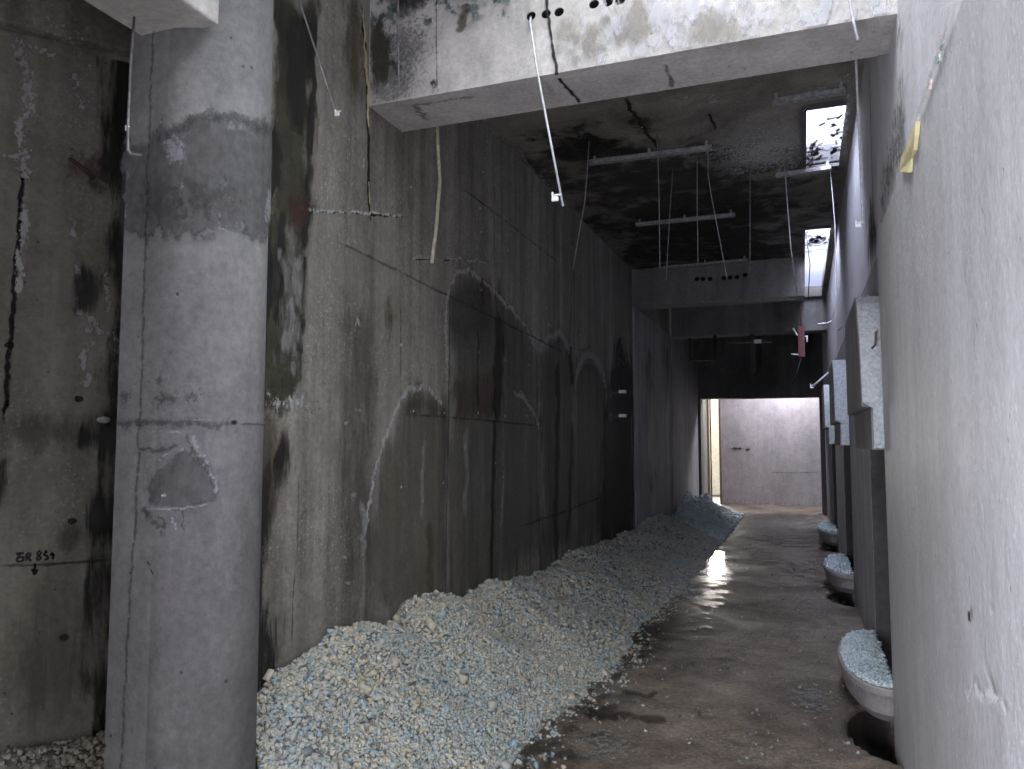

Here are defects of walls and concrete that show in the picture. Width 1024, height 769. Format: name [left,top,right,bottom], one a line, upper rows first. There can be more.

crack [2,36,38,419]
damp [298,20,318,354]
crack [289,8,404,226]
damp [342,0,509,101]
crack [545,0,580,103]
crack [625,99,657,148]
damp [569,0,895,67]
damp [868,78,904,271]
damp [73,59,286,737]
spalling [140,429,219,534]
damp [257,391,311,693]
damp [360,266,635,607]